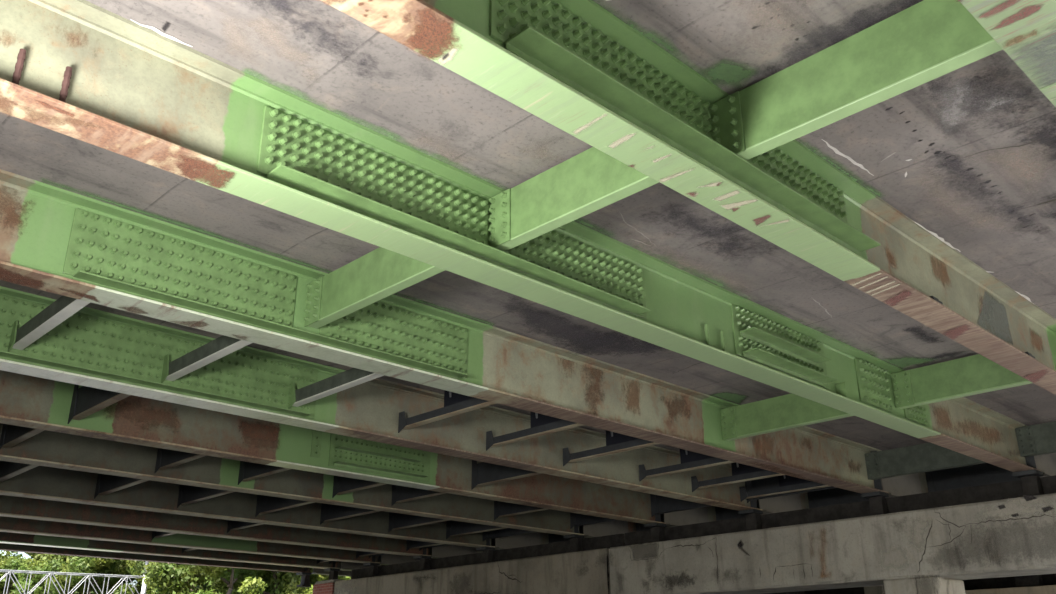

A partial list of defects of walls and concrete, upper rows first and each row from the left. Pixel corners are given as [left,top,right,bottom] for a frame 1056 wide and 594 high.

corrosion [404,8,455,59]
corrosion [26,100,89,126]
corrosion [177,155,234,188]
corrosion [0,267,44,289]
crack [915,510,1056,594]